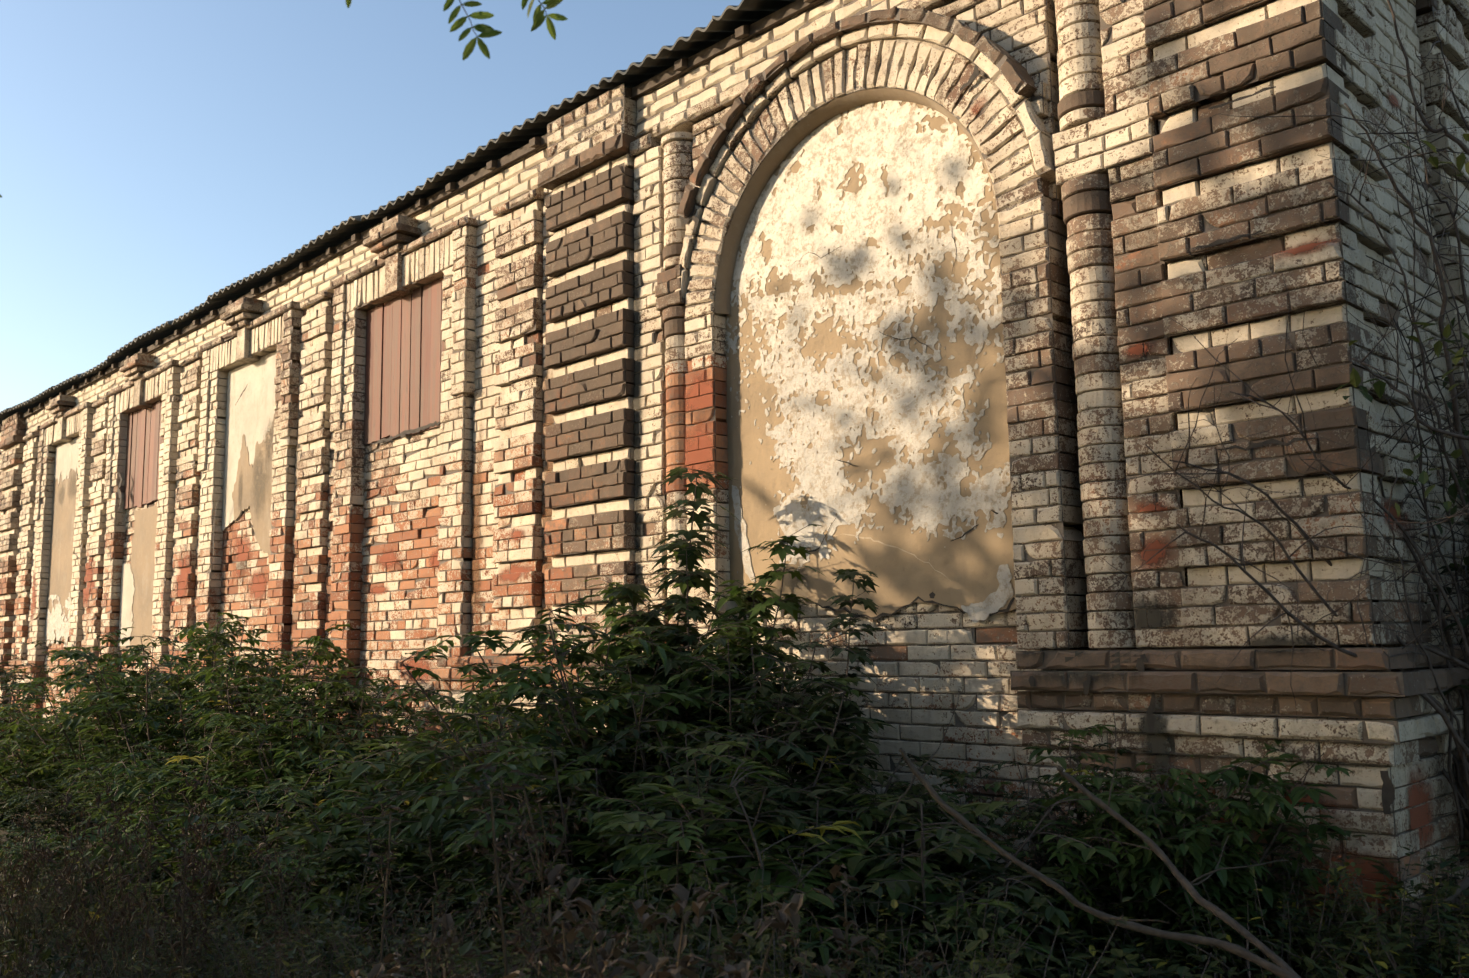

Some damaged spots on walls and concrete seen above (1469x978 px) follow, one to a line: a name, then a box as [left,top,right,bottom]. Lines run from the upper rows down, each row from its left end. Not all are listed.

peeling [685,100,1012,583]
peeling [31,559,95,647]
peeling [118,563,135,646]
flaking render [232,413,275,602]
peeling [430,552,439,569]
peeling [498,564,532,582]
peeling [511,529,526,541]
peeling [961,564,1014,623]
peeling [399,657,430,684]